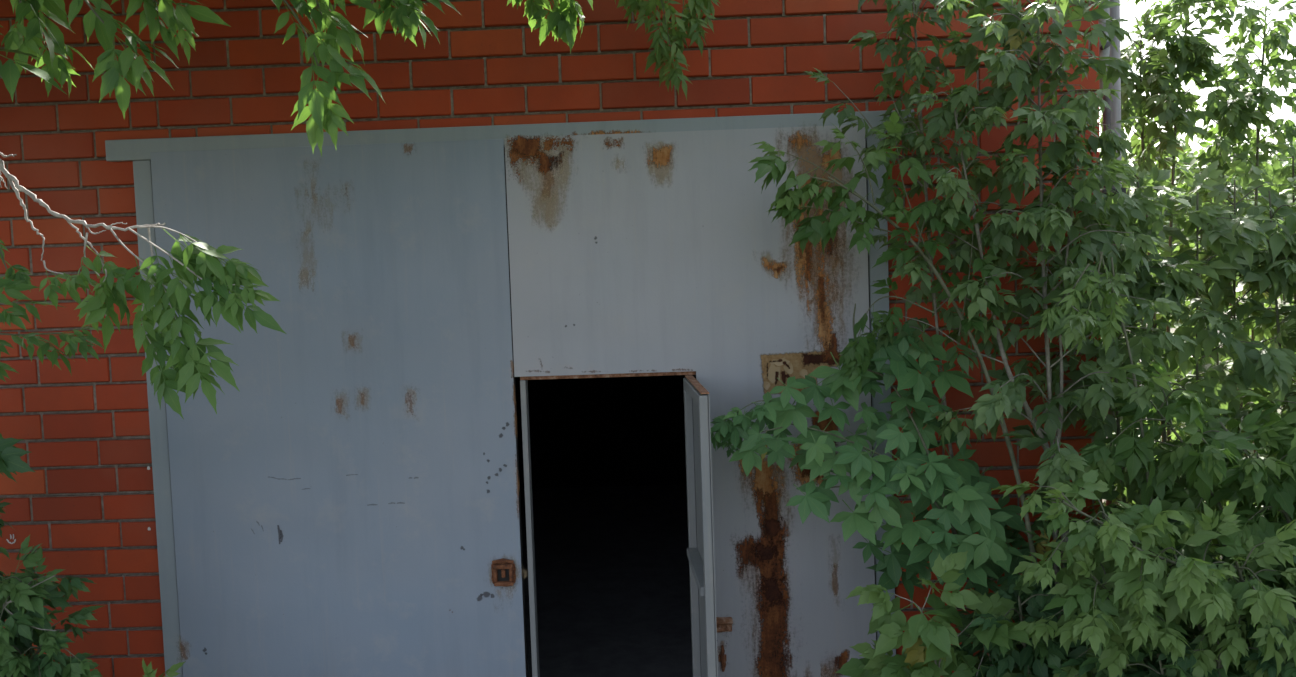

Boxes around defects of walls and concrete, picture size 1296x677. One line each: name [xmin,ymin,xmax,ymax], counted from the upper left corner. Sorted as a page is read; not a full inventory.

corrosion [507,130,642,179]
corrosion [647,145,672,168]
corrosion [762,132,852,354]
corrosion [735,411,850,677]